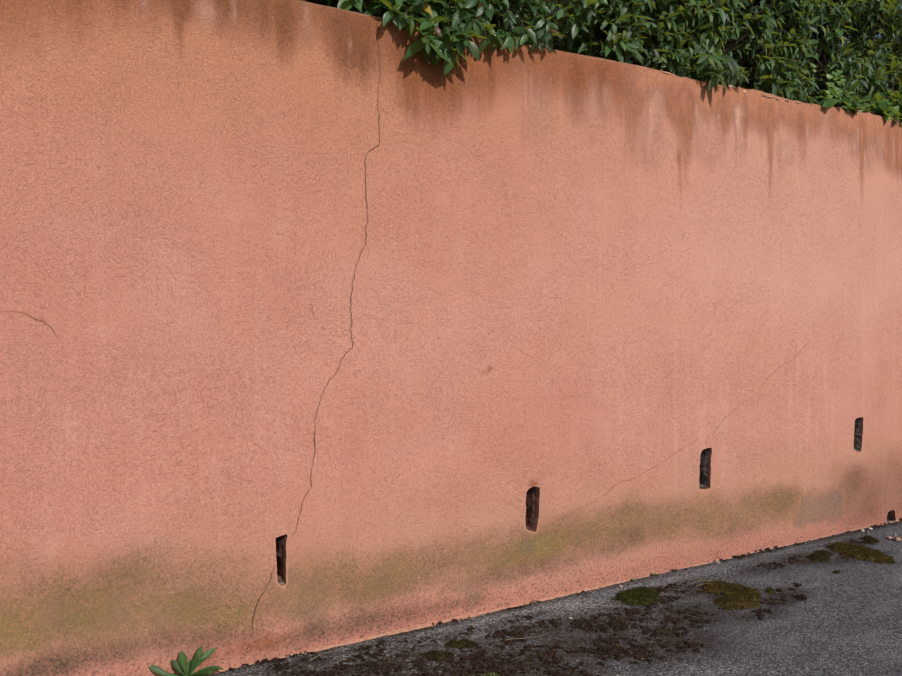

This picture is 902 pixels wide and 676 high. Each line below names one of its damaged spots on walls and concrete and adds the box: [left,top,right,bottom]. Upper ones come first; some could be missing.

damp [201,0,385,66]
damp [398,25,514,102]
damp [525,46,902,171]
damp [6,654,97,676]